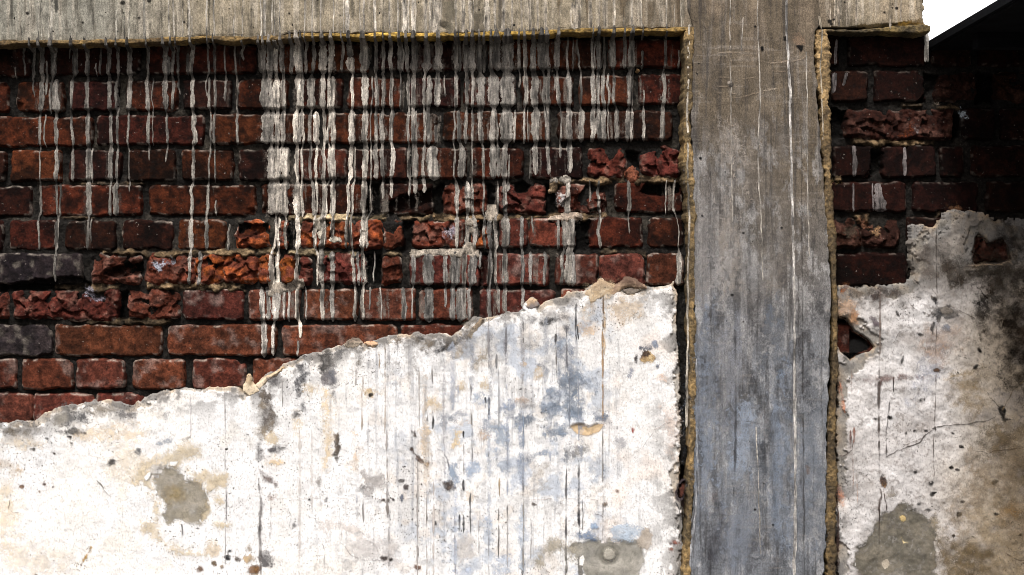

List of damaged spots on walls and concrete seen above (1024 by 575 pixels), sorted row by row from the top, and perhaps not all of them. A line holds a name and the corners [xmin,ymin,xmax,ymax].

damp [14,0,654,575]
peeling [526,298,540,309]
peeling [585,276,647,303]
crack [912,232,988,318]
peeling [344,338,378,348]
flaking render [628,340,659,377]
spalling [841,316,869,361]
peeling [243,366,284,396]
crack [887,327,1024,476]
peeling [571,422,603,435]